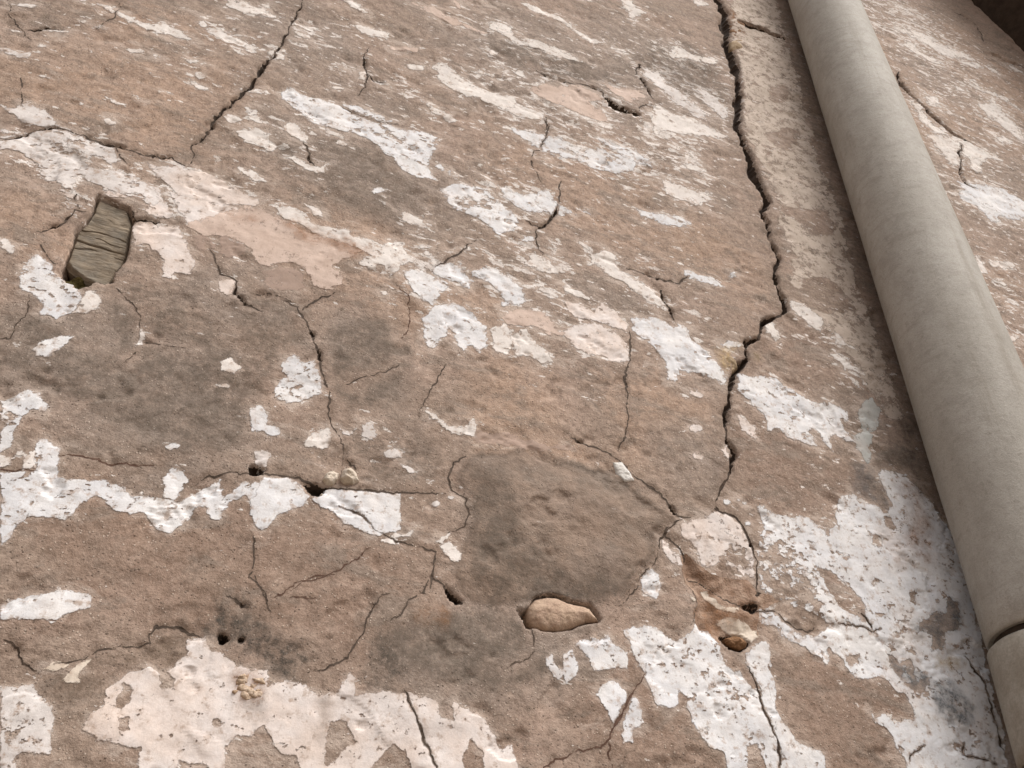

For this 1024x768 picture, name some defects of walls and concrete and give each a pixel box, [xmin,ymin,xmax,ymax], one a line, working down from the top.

crack [5,0,303,166]
peeling [0,0,904,464]
crack [526,117,562,253]
crack [957,140,977,189]
crack [564,0,879,633]
peeling [0,390,415,544]
crack [192,250,471,673]
crack [3,624,199,674]
peeling [83,636,519,768]
peeling [437,533,462,562]
peeling [546,467,1008,768]